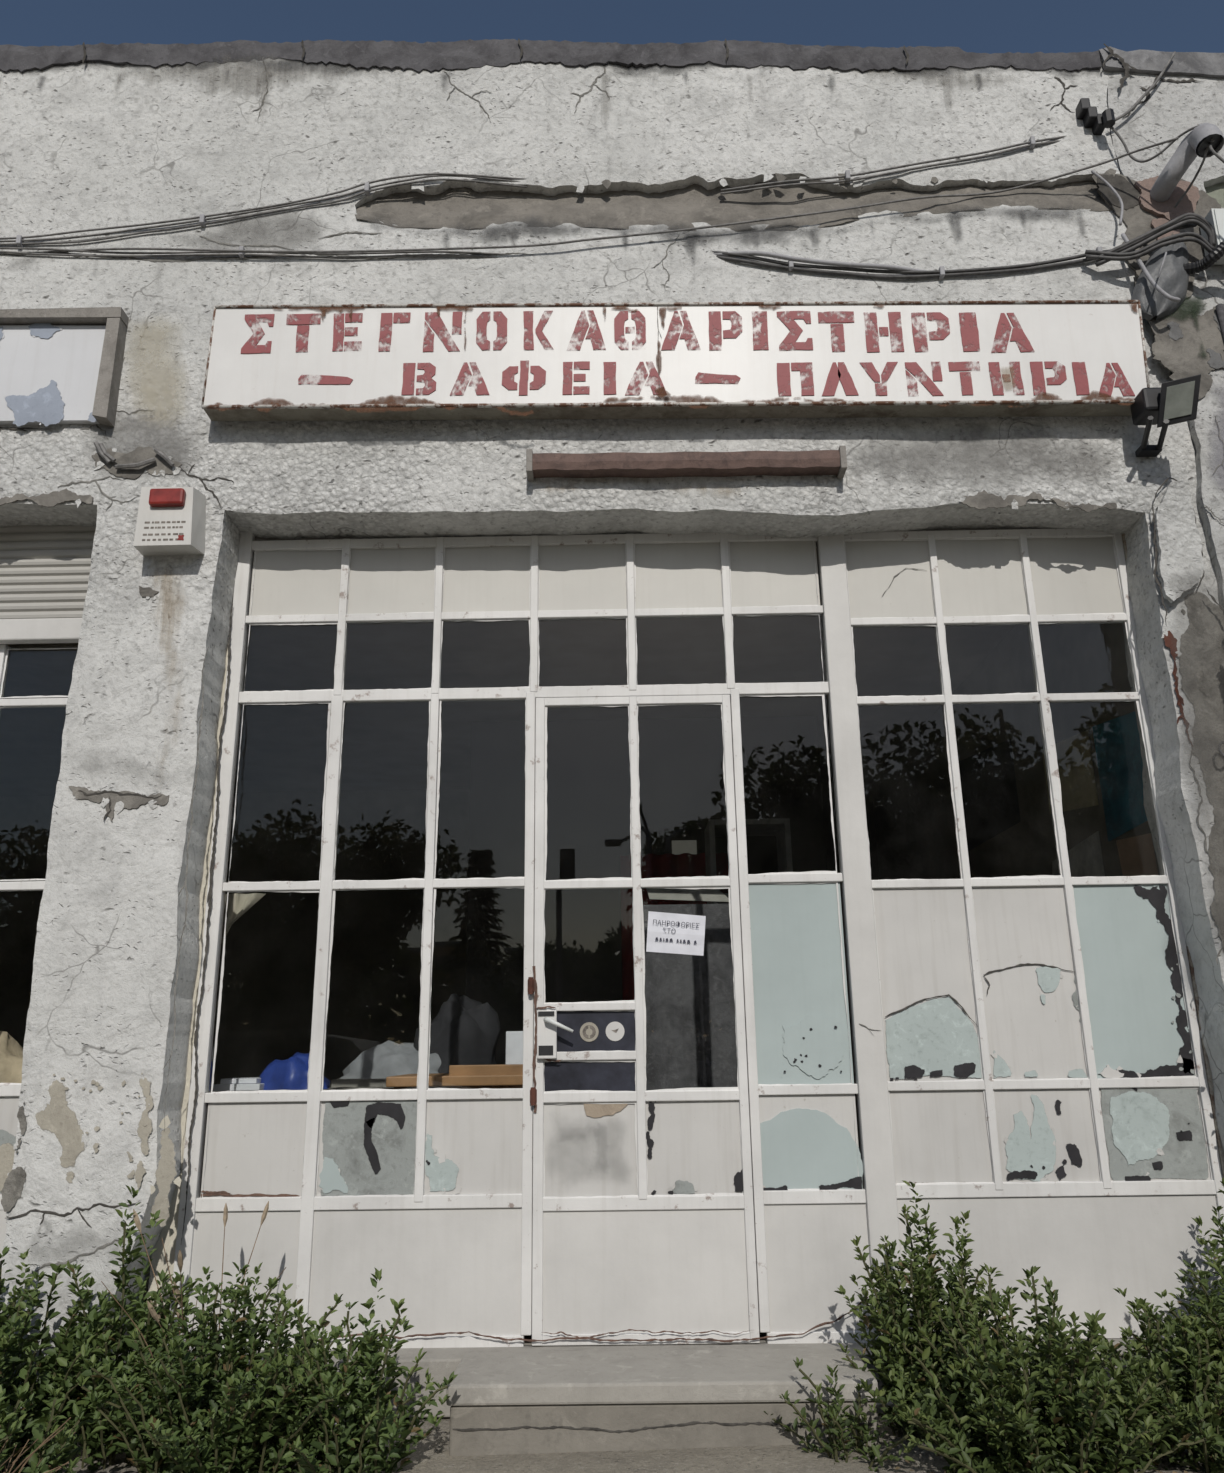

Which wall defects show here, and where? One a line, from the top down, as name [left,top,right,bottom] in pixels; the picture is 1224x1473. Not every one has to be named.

crack [444,71,491,122]
crack [572,65,610,113]
spalling [355,168,1224,400]
spalling [91,441,182,480]
crack [1152,416,1224,626]
spalling [68,786,169,822]
peeling [1161,591,1224,943]
crack [1172,661,1224,965]
crack [78,604,233,1242]
peeling [0,1074,103,1212]
peeling [119,1073,182,1227]
crack [6,1200,140,1274]